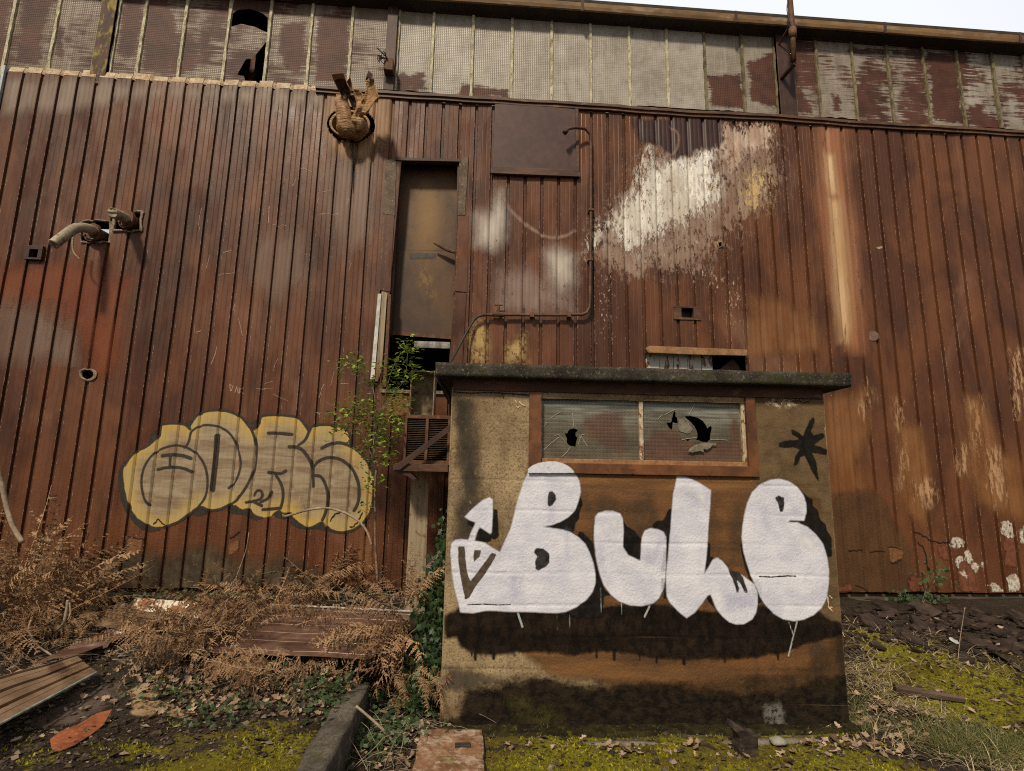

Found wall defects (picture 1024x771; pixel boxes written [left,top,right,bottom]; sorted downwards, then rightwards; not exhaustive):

peeling [586,121,777,330]
peeling [938,521,1024,592]